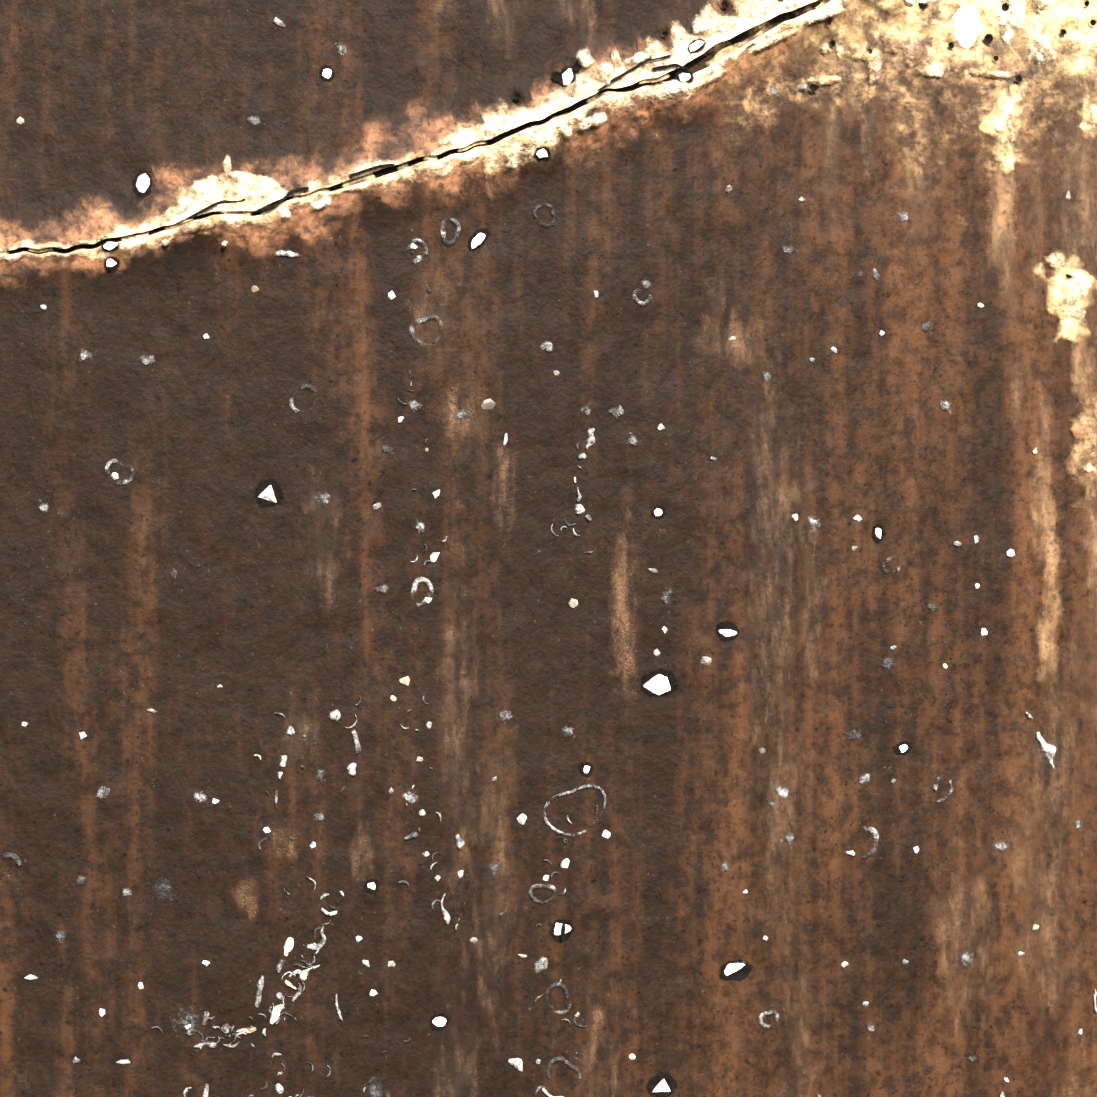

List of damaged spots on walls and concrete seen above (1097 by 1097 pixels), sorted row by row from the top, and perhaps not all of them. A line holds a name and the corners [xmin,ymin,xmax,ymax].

peeling [558,66,576,88]
peeling [675,71,694,84]
peeling [687,39,707,54]
spalling [729,44,785,114]
spalling [797,0,1097,173]
crack [0,0,882,281]
spalling [1036,253,1092,340]